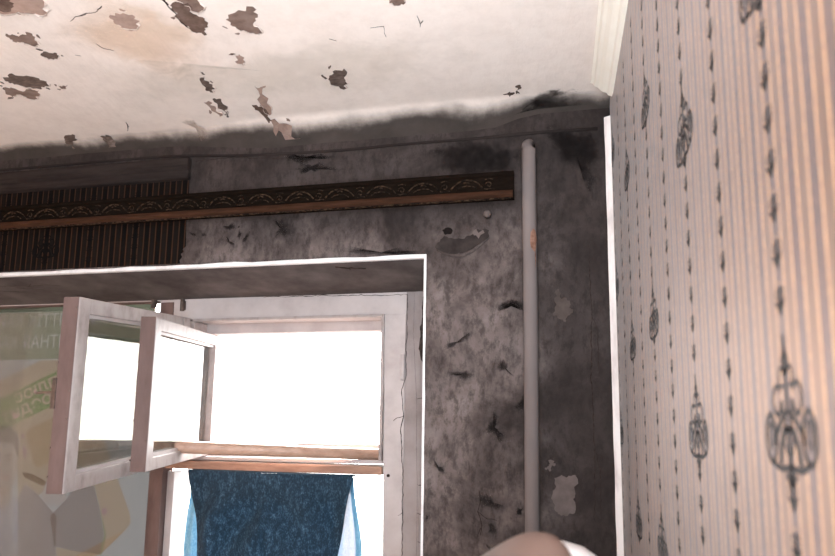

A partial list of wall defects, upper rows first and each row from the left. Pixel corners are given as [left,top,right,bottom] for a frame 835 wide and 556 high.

peeling [0,0,52,18]
peeling [109,8,142,31]
peeling [170,0,208,36]
peeling [222,6,264,35]
peeling [5,32,63,60]
peeling [0,73,67,100]
peeling [200,72,229,118]
peeling [252,86,300,140]
peeling [321,65,349,90]
water stain [524,91,567,112]
water stain [288,154,327,173]
water stain [552,132,595,178]